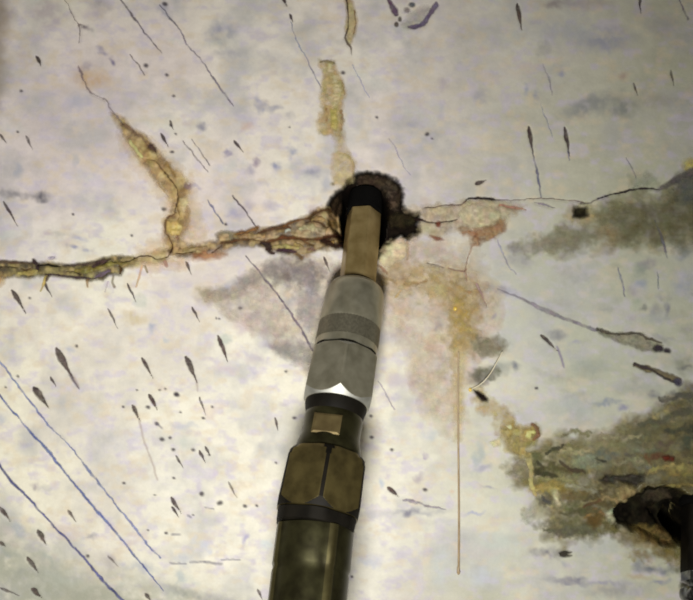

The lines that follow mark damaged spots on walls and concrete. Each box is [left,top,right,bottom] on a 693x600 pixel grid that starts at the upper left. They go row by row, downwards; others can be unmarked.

crack [0,68,344,292]
spalling [328,172,420,257]
crack [379,238,407,265]
crack [415,169,693,306]
leakage [534,160,693,252]
leakage [379,241,504,420]
leakage [478,388,693,539]
spalling [601,474,686,545]